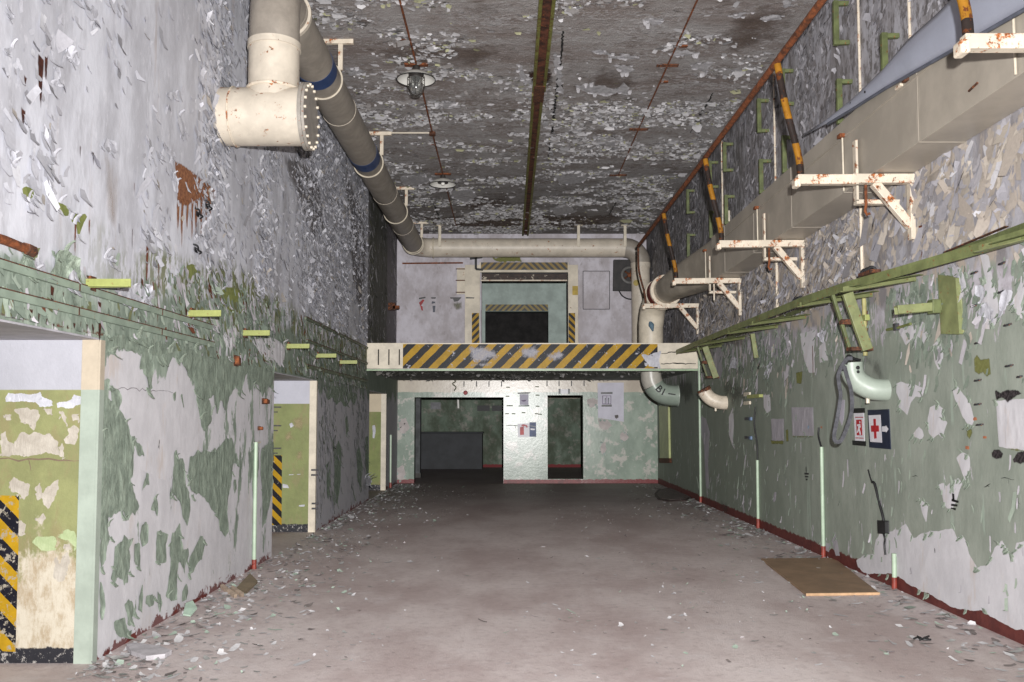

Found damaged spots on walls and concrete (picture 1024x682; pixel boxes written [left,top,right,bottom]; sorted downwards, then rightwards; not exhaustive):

corrosion [175,162,215,234]
peeling [0,0,609,645]
peeling [308,0,889,279]
peeling [615,108,1024,521]
peeling [894,0,950,52]
flaking render [831,446,1024,630]